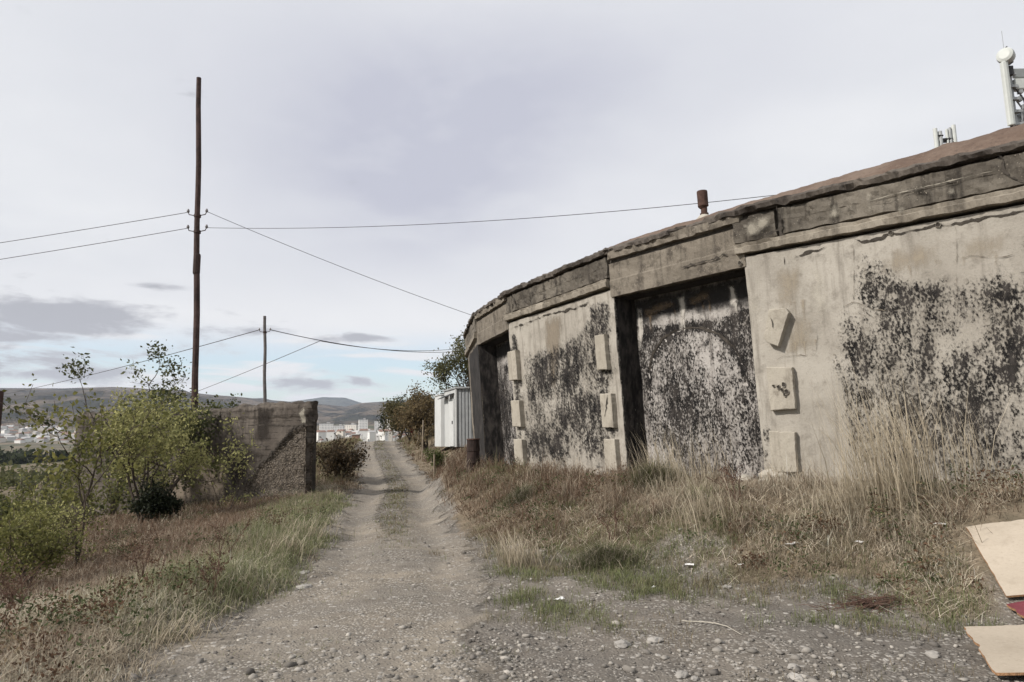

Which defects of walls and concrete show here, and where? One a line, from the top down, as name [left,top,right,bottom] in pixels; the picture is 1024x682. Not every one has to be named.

crack [848,210,1024,318]
water stain [546,319,560,382]